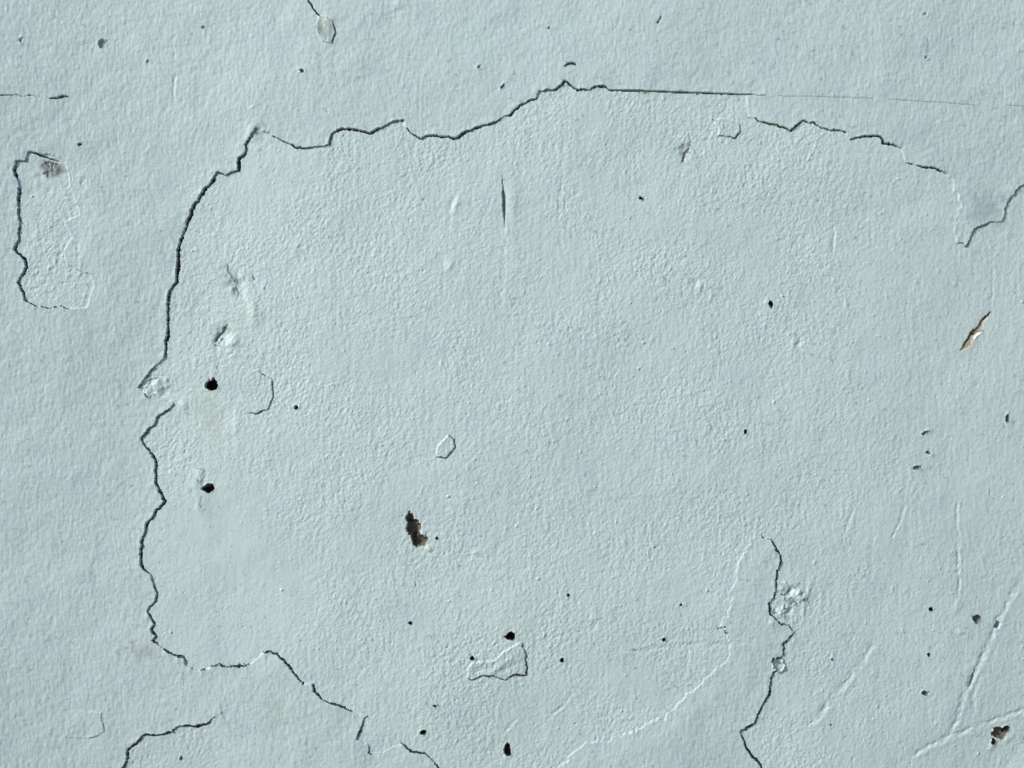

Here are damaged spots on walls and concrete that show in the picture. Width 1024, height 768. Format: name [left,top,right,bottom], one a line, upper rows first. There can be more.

crack [611,90,976,106]
crack [203,264,256,300]
peeling [121,79,1024,768]